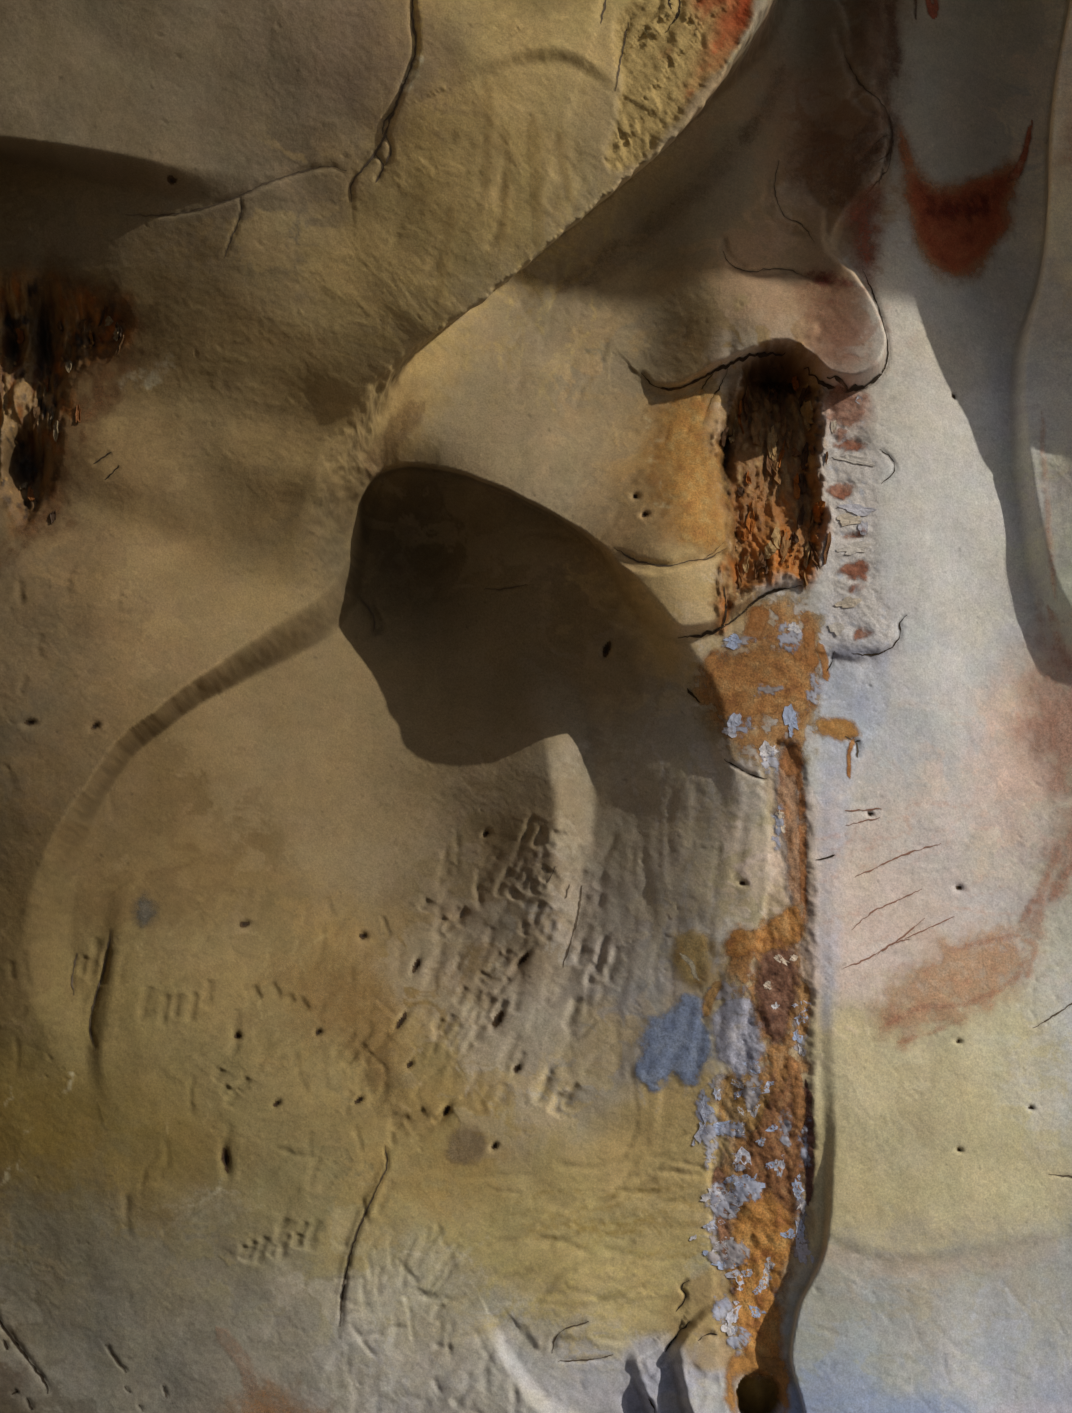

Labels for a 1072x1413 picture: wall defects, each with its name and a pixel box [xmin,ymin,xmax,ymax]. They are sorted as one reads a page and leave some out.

crack [133,0,417,258]
spalling [608,0,755,172]
rust [899,120,1033,277]
peeling [722,713,751,738]
peeling [754,674,822,773]
peeling [772,806,786,849]
rust [674,589,859,1411]
crack [340,1149,388,1327]
peeling [636,981,814,1356]